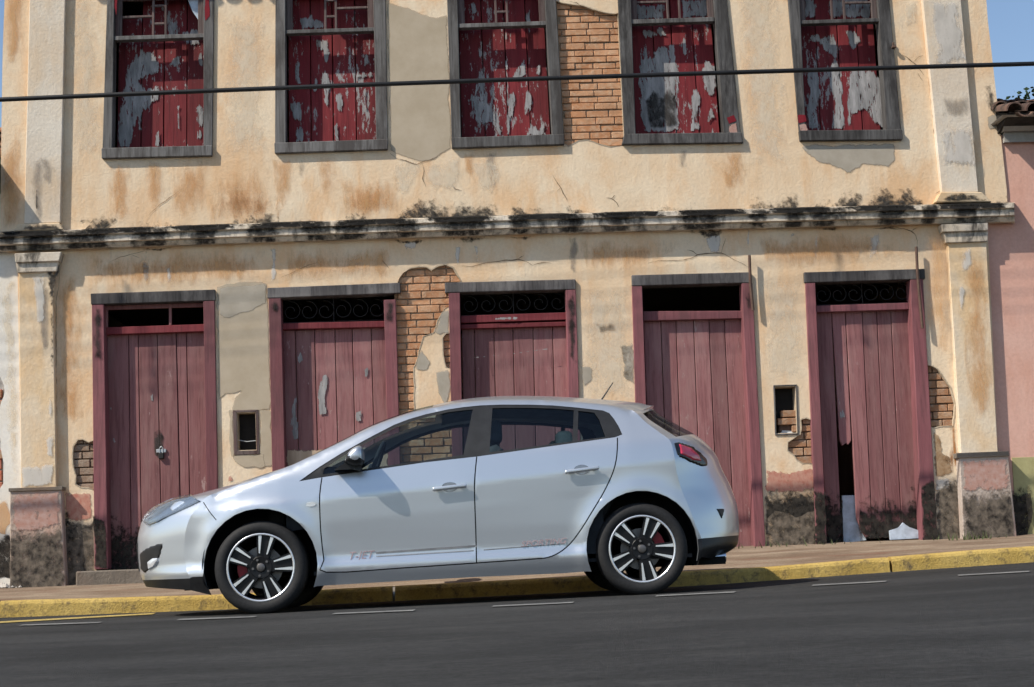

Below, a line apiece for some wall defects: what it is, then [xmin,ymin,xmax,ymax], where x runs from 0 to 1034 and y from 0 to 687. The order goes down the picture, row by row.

spalling [556,1,624,148]
peeling [637,4,716,132]
peeling [727,115,737,132]
damp [0,165,1006,280]
peeling [33,277,44,321]
damp [41,264,71,373]
spalling [362,264,461,469]
peeling [12,437,94,531]
spalling [765,410,813,493]
damp [765,490,844,546]
damp [858,480,1033,540]
spalling [928,365,1008,491]